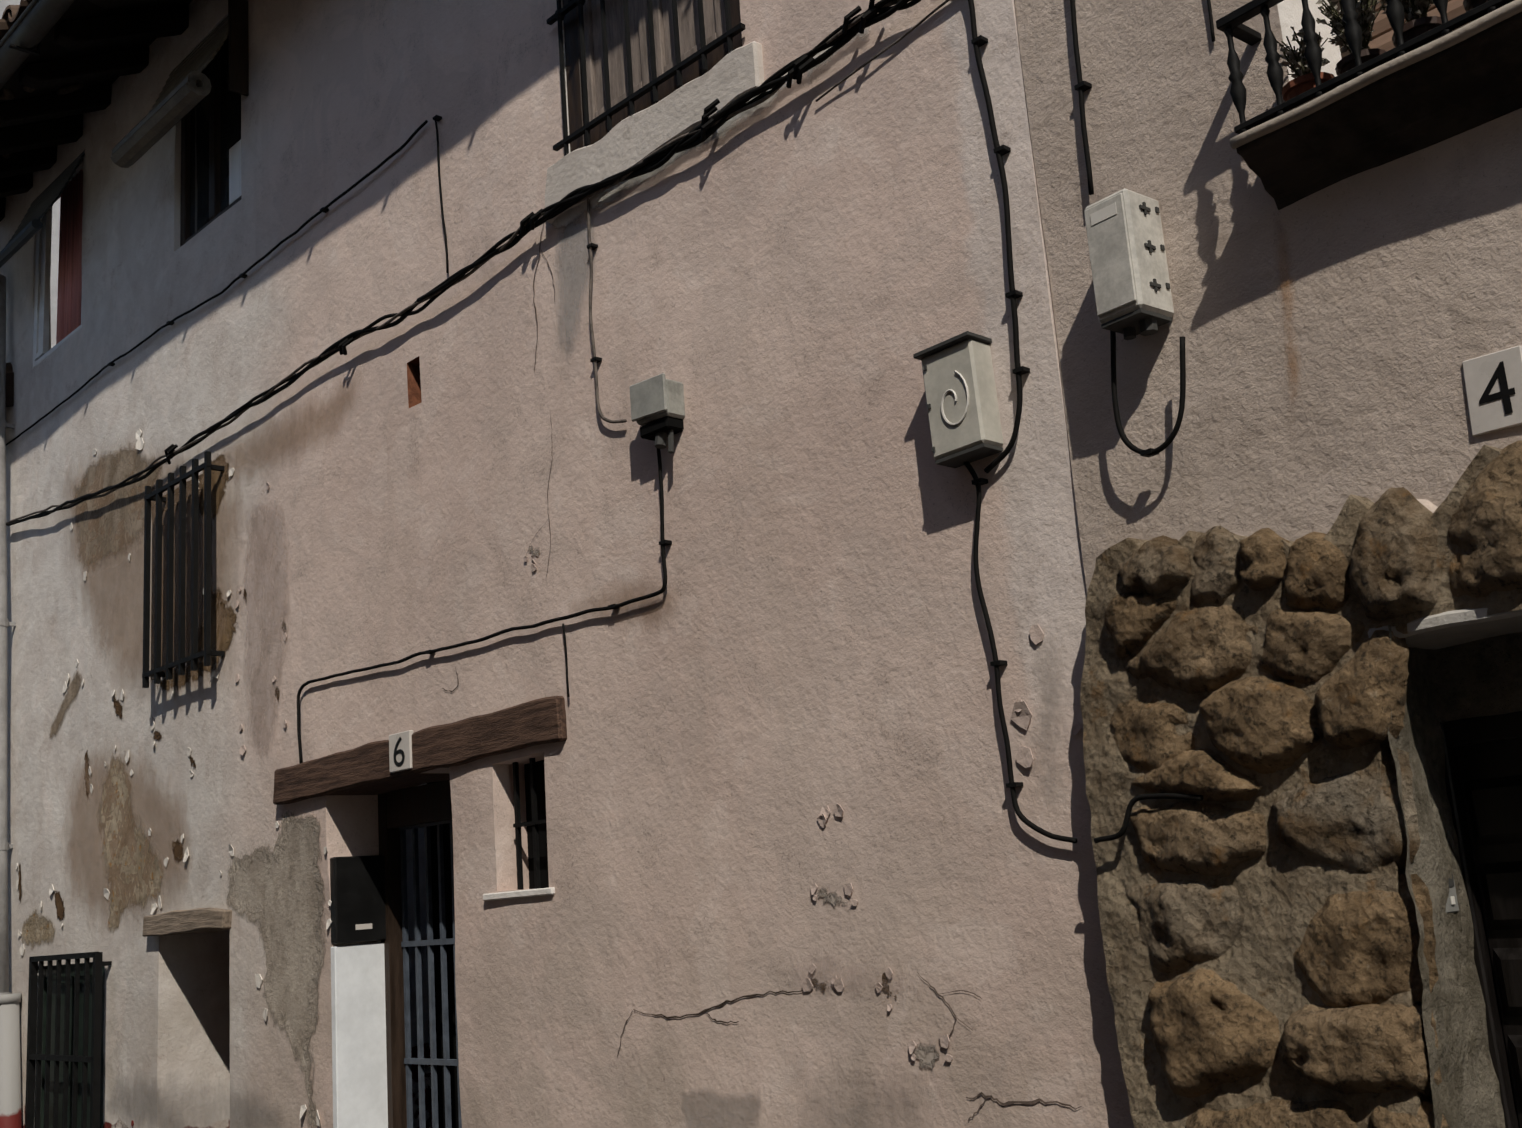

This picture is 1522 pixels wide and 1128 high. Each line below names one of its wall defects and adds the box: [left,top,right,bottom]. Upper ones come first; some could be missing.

peeling [69,429,166,581]
spalling [199,454,235,519]
peeling [49,659,84,738]
spalling [111,689,124,718]
spalling [149,717,162,748]
peeling [84,745,189,930]
peeling [16,863,65,956]
peeling [219,812,332,1128]
crack [617,990,802,1057]
crack [917,972,982,1036]
crack [966,1092,1082,1121]